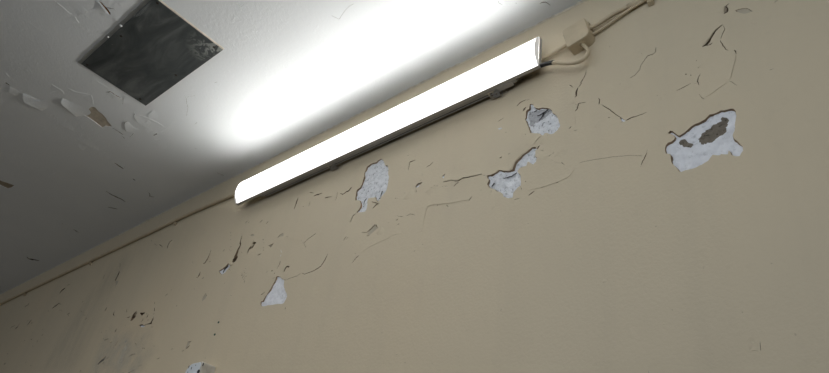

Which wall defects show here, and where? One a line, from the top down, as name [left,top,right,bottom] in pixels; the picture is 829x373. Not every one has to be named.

crack [698,23,725,47]
peeling [23,85,141,142]
spalling [523,104,560,135]
spalling [665,109,743,172]
spalling [340,159,389,212]
spalling [486,145,540,198]
spalling [261,254,328,308]